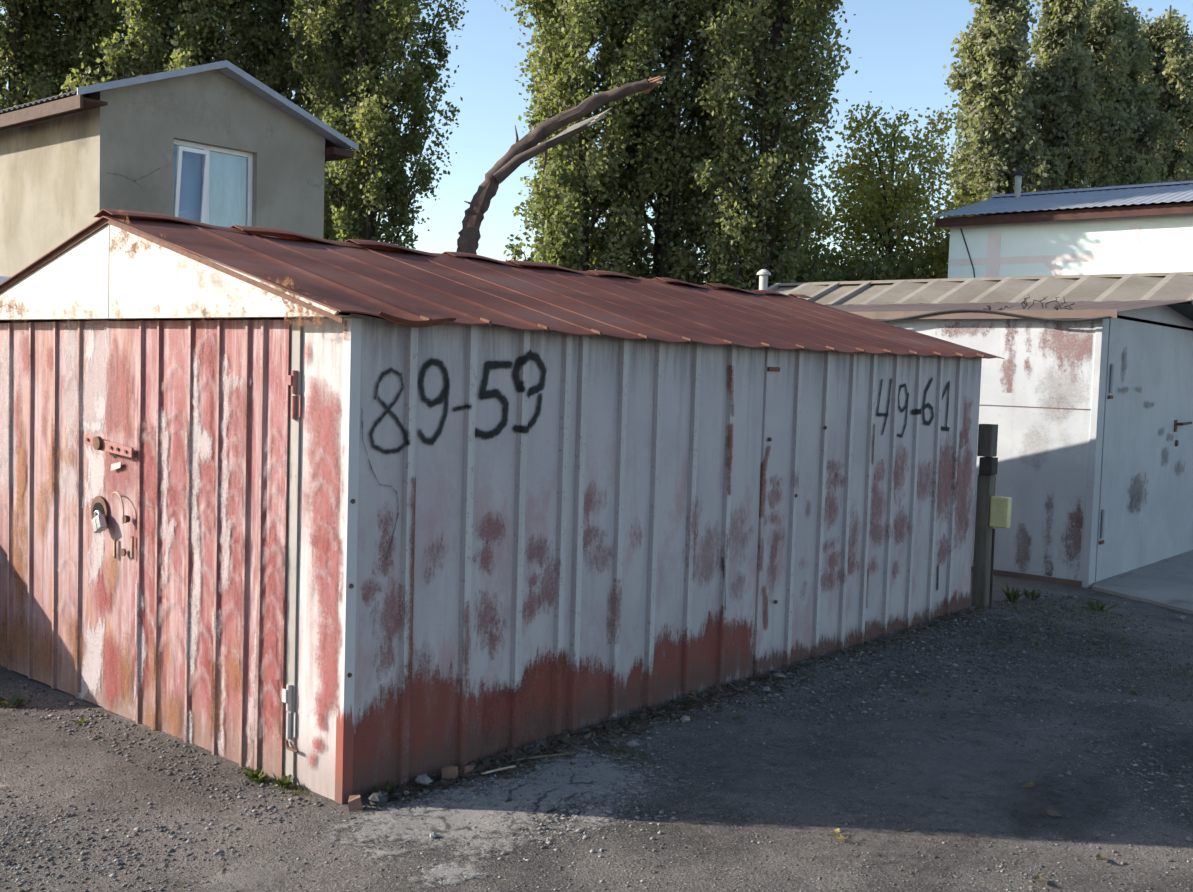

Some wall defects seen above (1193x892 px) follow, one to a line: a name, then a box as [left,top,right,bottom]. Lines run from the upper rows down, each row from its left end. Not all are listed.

corrosion [109,211,162,260]
corrosion [260,278,347,334]
peeling [21,337,29,371]
corrosion [1001,322,1093,393]
corrosion [726,365,734,495]
corrosion [759,447,771,516]
peeling [46,326,245,753]
peeling [304,381,342,766]